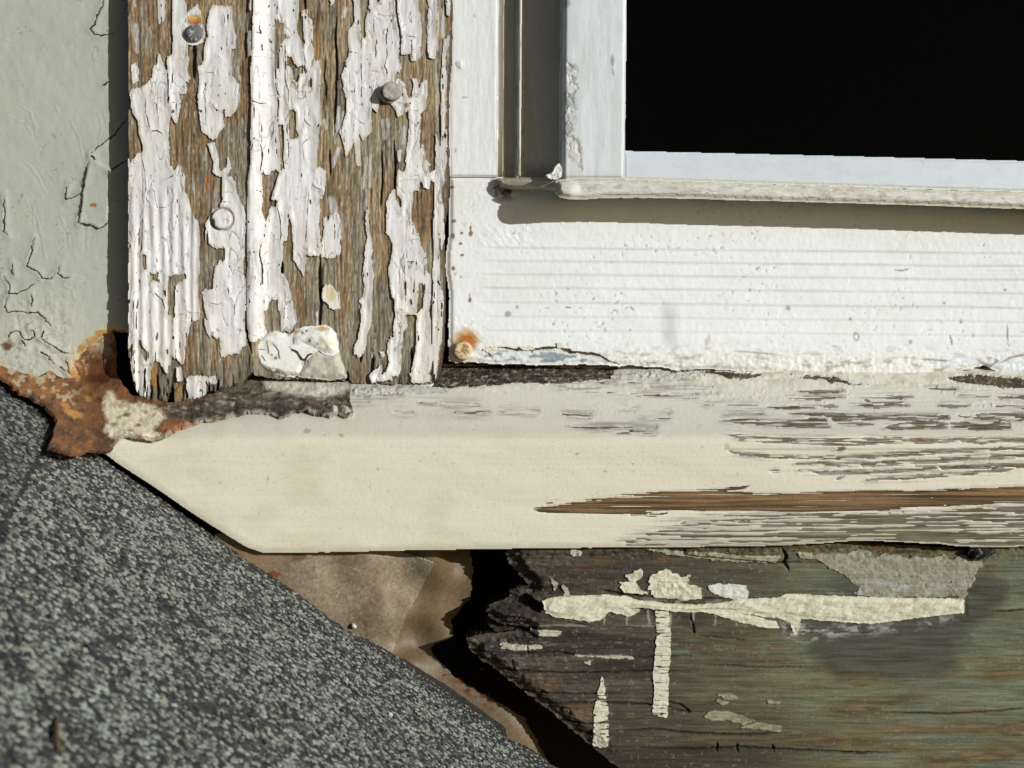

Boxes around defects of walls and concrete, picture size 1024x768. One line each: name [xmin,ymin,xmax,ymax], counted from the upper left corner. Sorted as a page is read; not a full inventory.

peeling [128,0,342,399]
peeling [339,0,621,396]
crack [3,200,70,374]
rust [454,329,478,349]
peeling [670,370,762,380]
peeling [532,372,1024,601]
peeling [500,628,562,651]
peeling [575,654,634,665]
peeling [704,693,783,733]